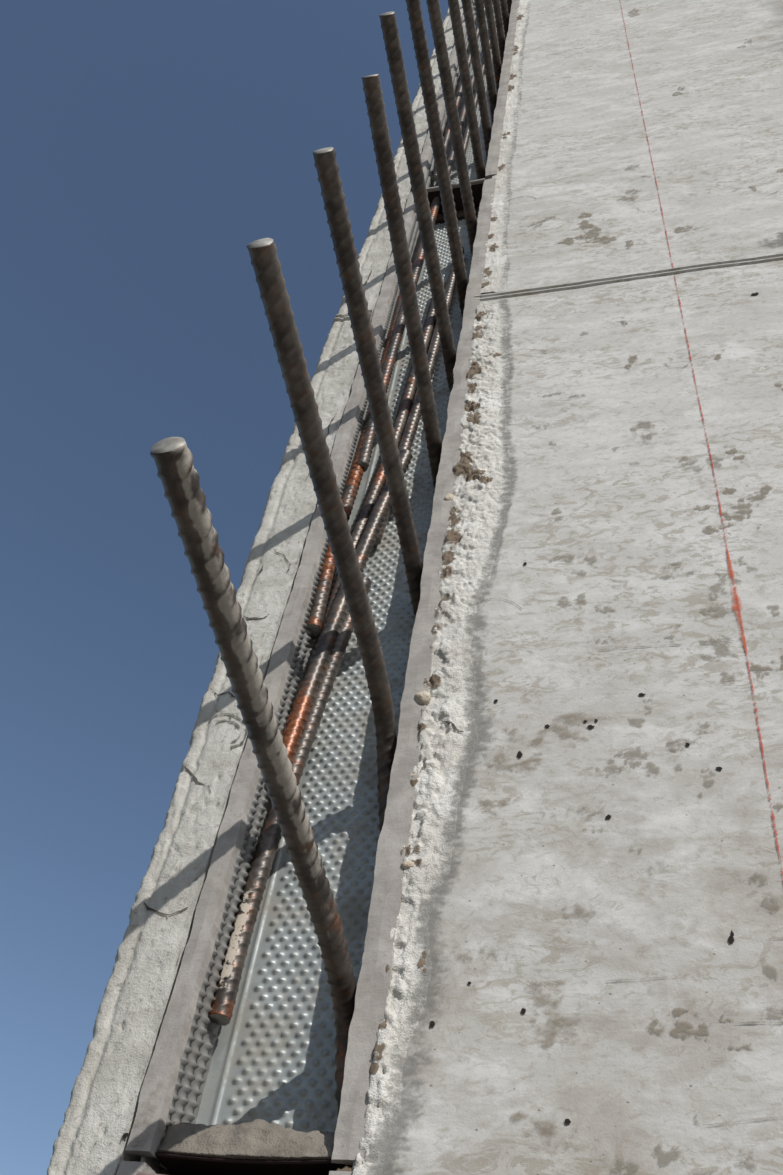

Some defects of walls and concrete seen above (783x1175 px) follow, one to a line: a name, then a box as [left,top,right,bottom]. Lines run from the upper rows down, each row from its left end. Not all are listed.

spalling [150,0,531,1175]
damp [469,299,517,649]
damp [411,662,491,1031]
damp [370,1053,428,1175]